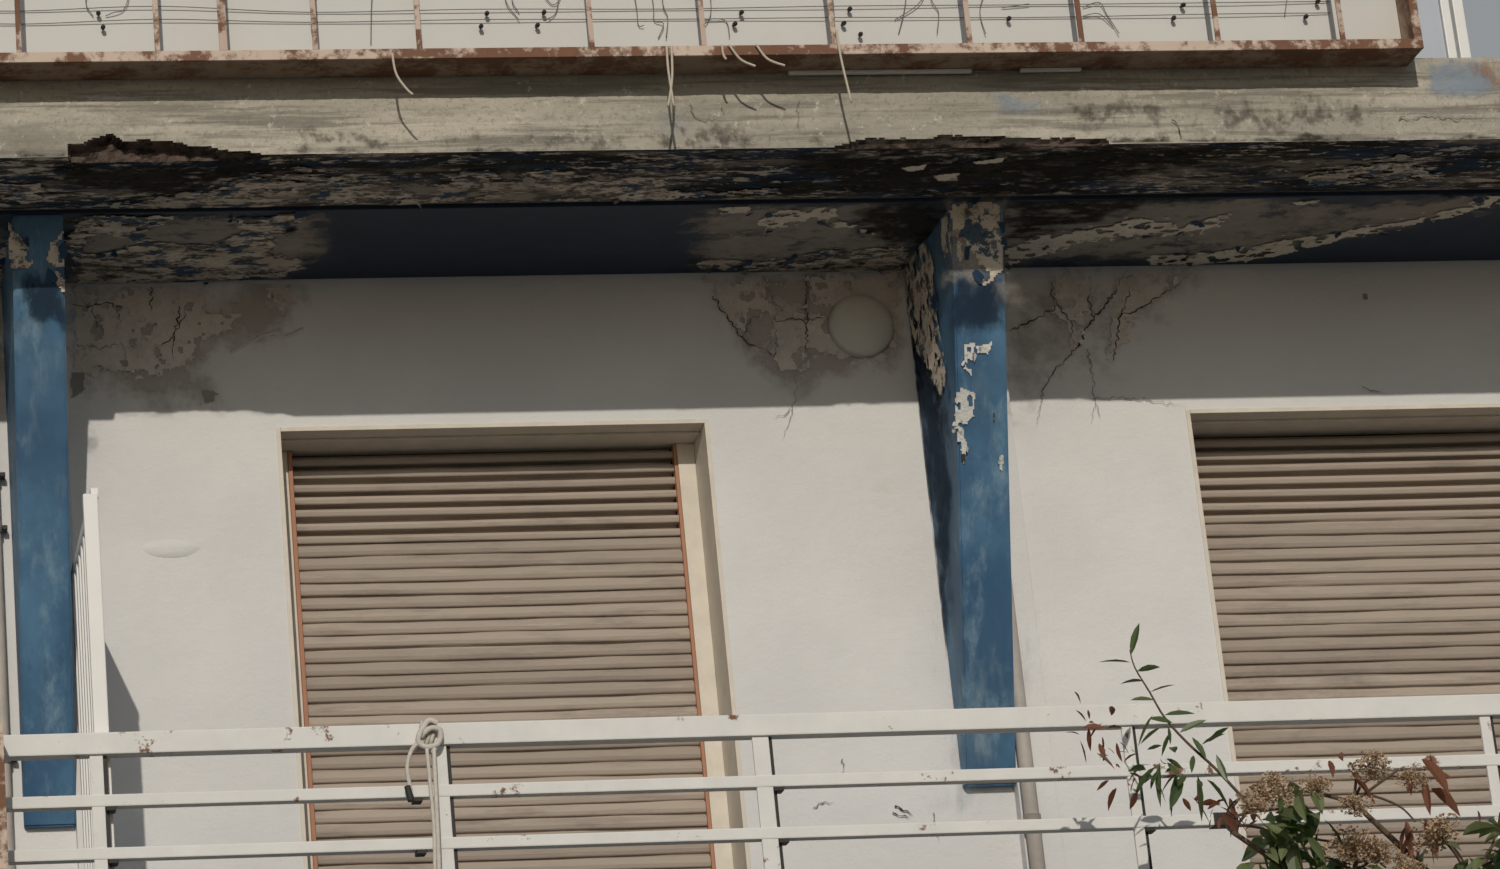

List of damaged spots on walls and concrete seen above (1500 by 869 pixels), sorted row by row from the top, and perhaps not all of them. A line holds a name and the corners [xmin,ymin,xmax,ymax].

peeling [0,134,1500,464]
crack [1011,271,1192,419]